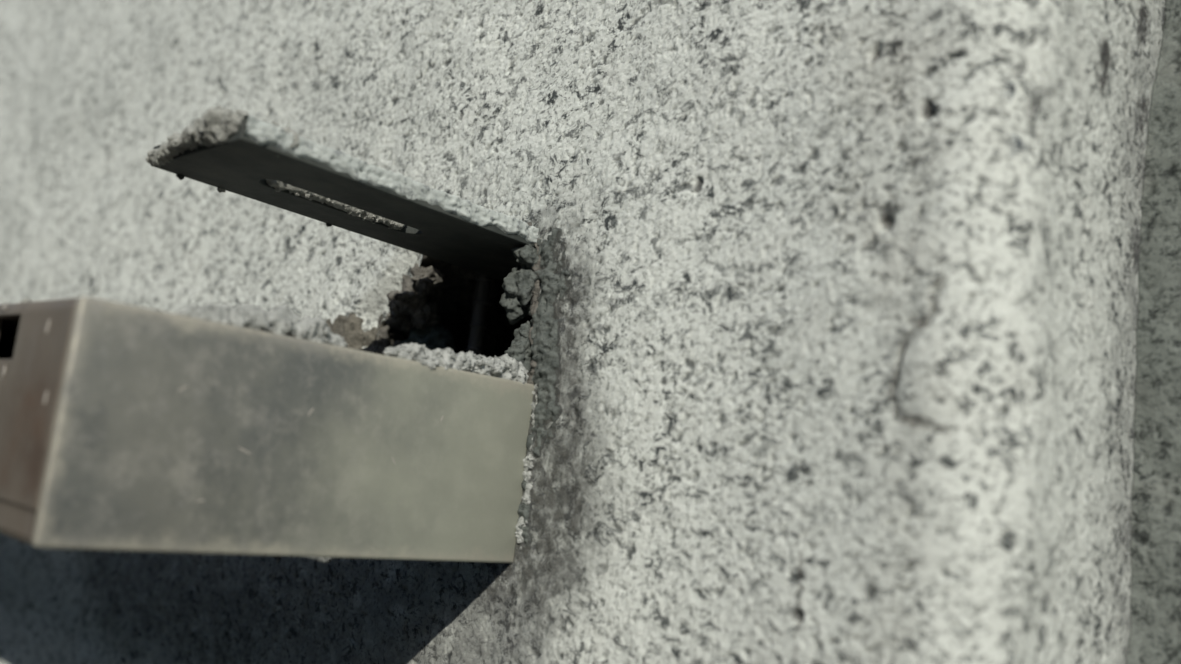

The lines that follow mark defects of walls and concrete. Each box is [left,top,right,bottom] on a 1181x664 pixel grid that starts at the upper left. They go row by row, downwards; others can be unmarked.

spalling [326,254,478,355]
spalling [482,228,574,460]
spalling [517,477,535,549]